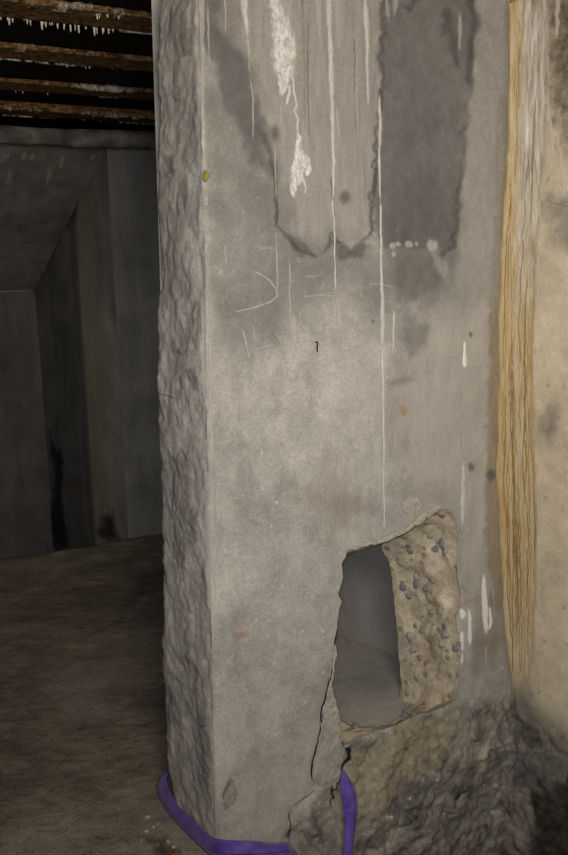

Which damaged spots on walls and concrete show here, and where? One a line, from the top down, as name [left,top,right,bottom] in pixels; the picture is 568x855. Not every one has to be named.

damp [538,0,568,195]
damp [202,0,478,528]
damp [396,98,506,664]
crack [286,630,351,838]
spalling [313,505,460,786]